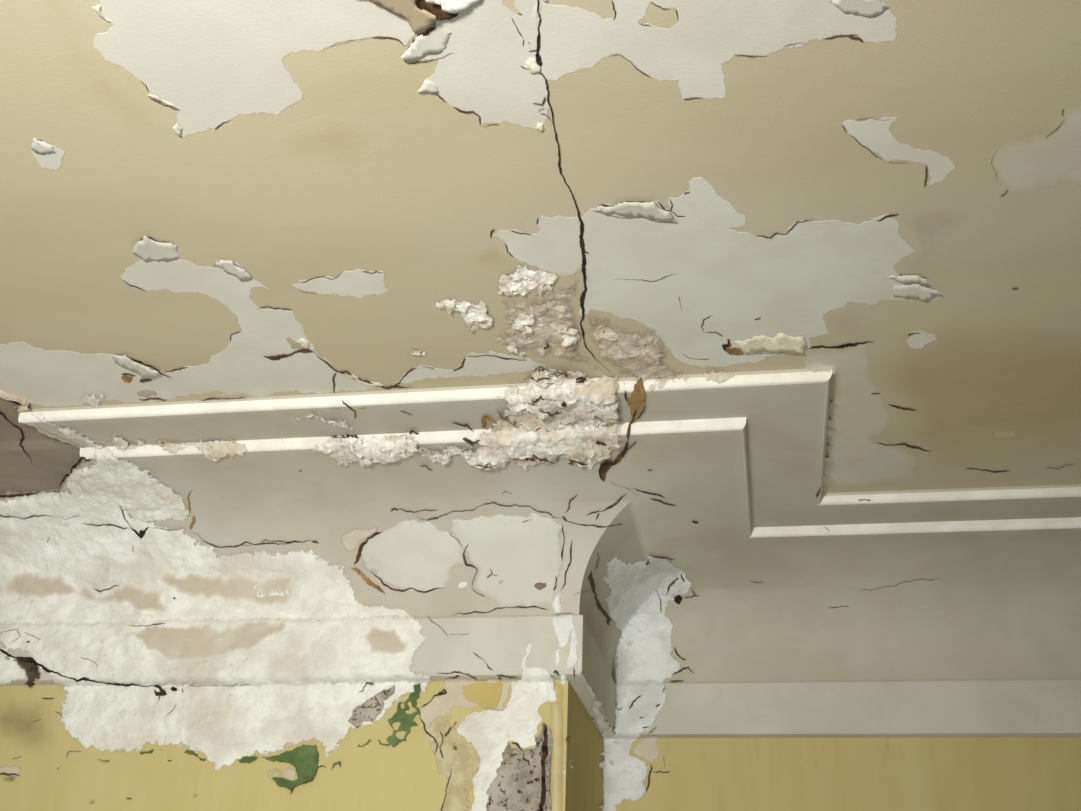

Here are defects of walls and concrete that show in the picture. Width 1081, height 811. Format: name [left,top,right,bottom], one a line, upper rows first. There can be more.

peeling [92,0,897,137]
peeling [842,117,955,188]
leakage [895,202,976,281]
peeling [0,235,375,498]
crack [391,0,699,811]
peeling [293,177,943,490]
leakage [809,304,1081,471]
crack [0,629,249,723]
flaking render [3,568,296,663]
spalling [348,685,395,728]
flaking render [421,643,557,811]
crack [830,578,947,608]